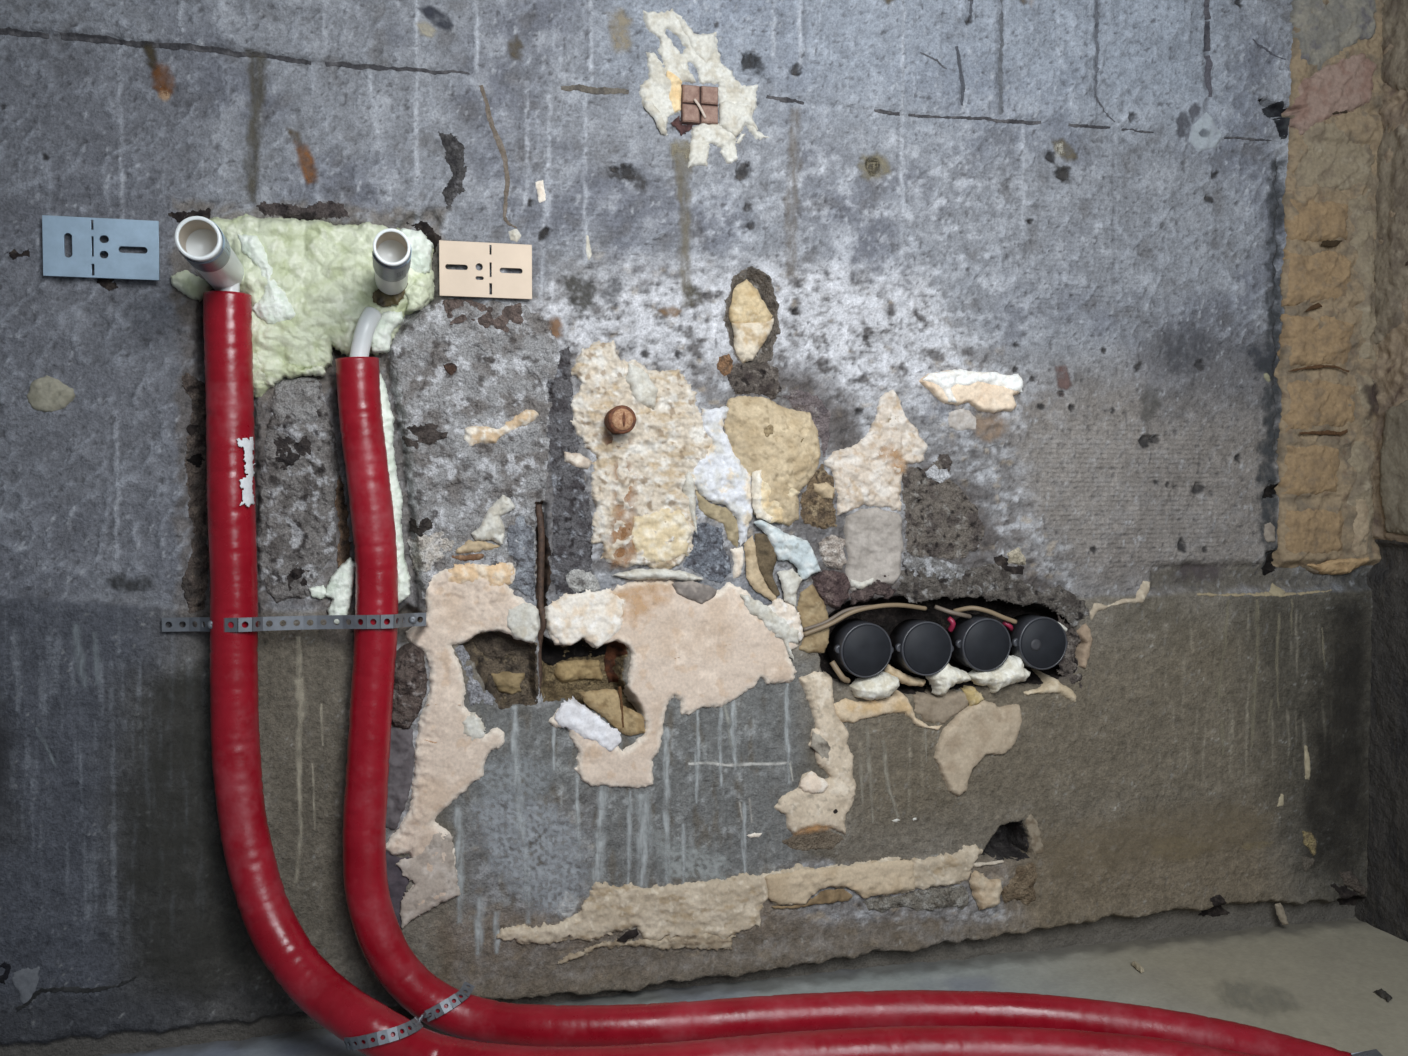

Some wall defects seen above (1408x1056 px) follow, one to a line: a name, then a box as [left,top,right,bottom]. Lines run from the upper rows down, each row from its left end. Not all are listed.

crack [0,27,517,229]
crack [561,84,629,95]
crack [766,95,804,105]
crack [874,0,1154,133]
flaking render [1263,0,1408,597]
spalling [372,283,600,601]
spalling [717,266,874,590]
flaking render [919,369,1023,414]
damp [110,577,150,591]
spalling [455,631,645,736]
flaking render [934,668,1077,796]
crack [0,961,137,1013]